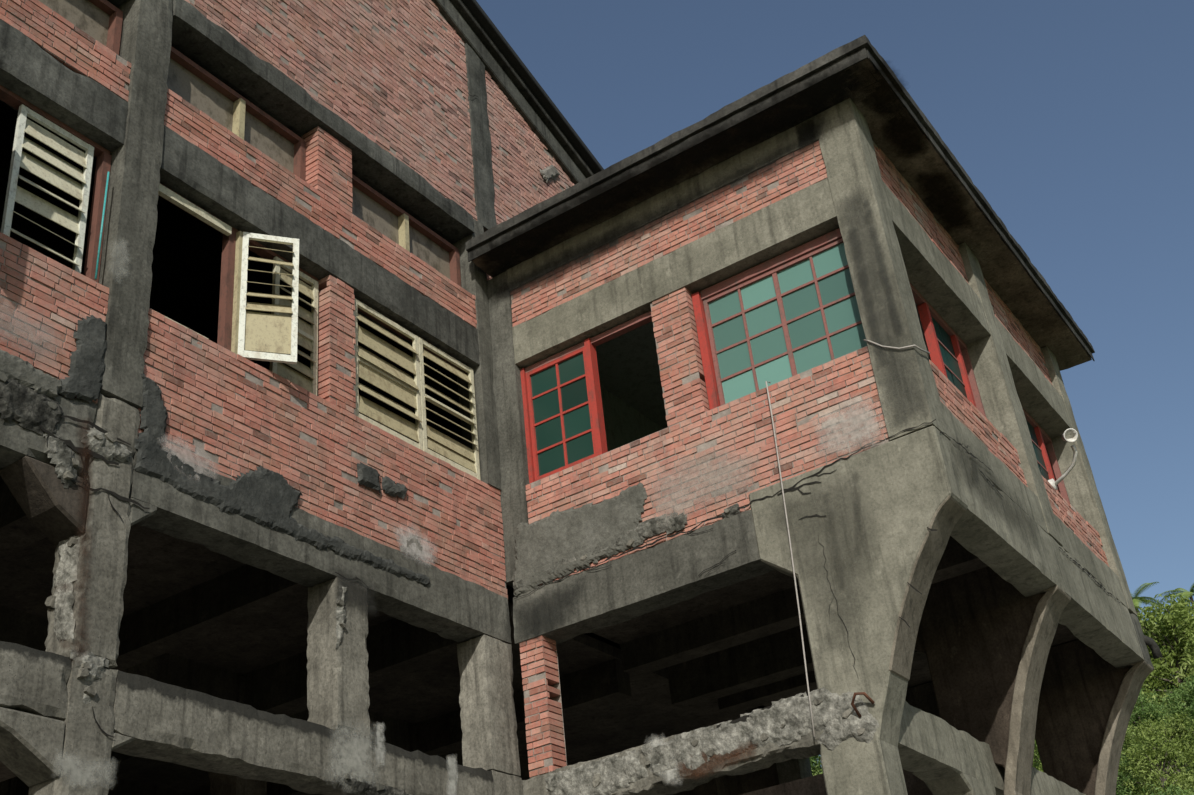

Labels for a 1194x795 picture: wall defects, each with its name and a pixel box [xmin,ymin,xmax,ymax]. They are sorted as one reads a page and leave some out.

damp [478,63,928,295]
damp [918,173,970,231]
spalling [0,371,132,488]
spalling [513,512,687,595]
crack [514,419,1003,676]
spalling [45,535,109,705]
spalling [335,582,347,649]
spalling [334,773,412,795]
spalling [545,687,879,795]